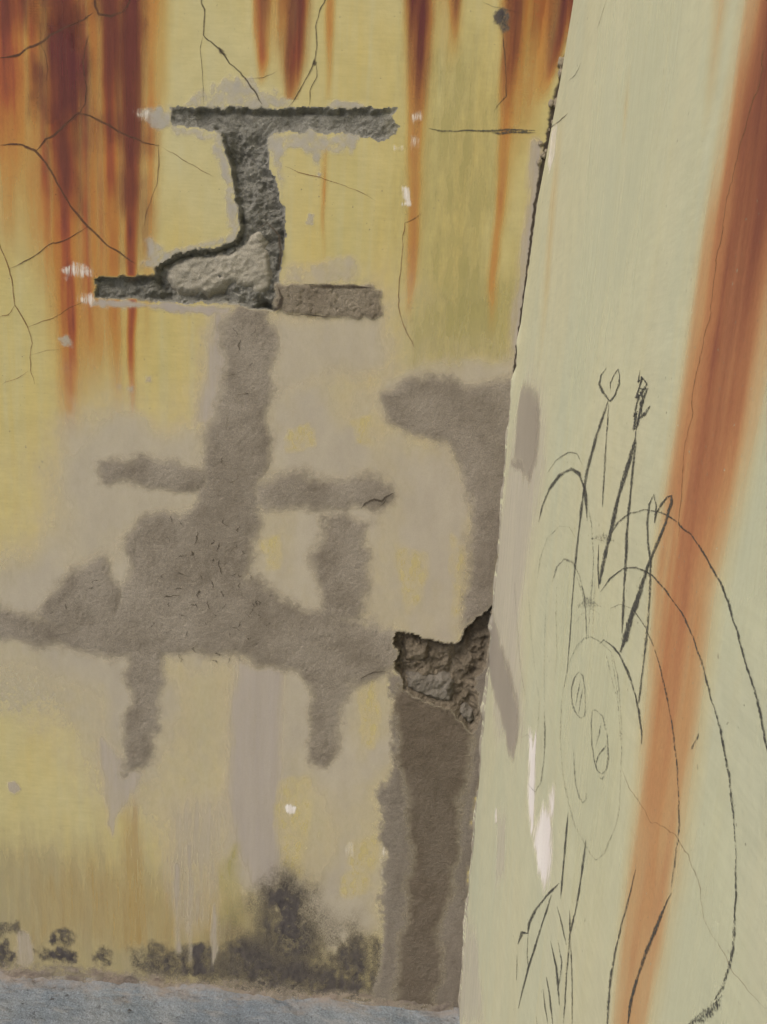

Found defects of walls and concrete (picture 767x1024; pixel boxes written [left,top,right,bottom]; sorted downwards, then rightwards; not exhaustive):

corrosion [0,0,159,426]
crack [0,0,212,384]
crack [200,0,275,104]
corrosion [254,0,309,100]
crack [289,1,325,106]
corrosion [406,0,432,302]
crack [513,56,581,373]
corrosion [616,0,767,1024]
spalling [392,605,492,734]
damp [488,613,519,756]
damp [0,922,77,968]
damp [92,795,381,1002]